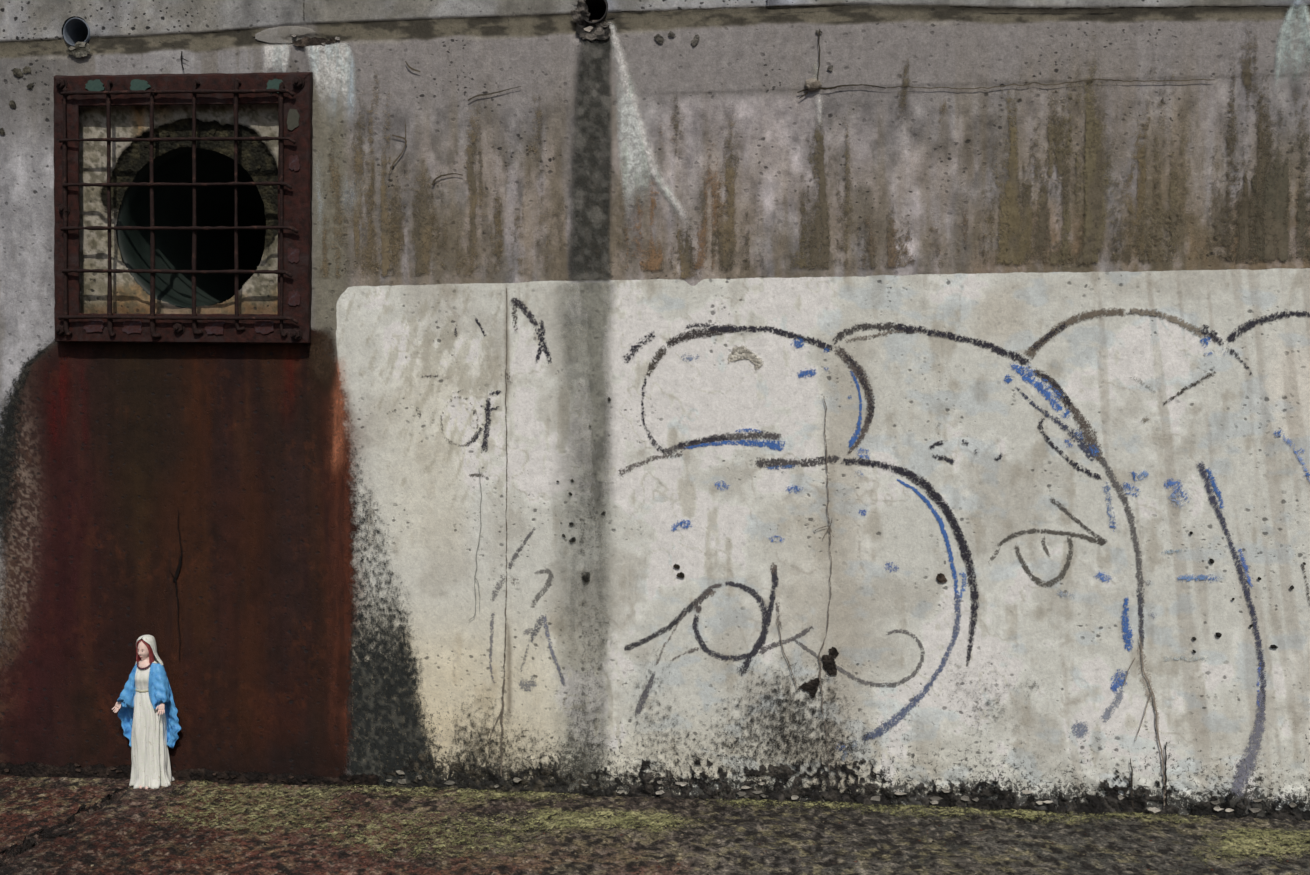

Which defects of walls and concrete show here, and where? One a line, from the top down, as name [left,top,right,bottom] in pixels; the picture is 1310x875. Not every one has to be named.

water stain [790,99,913,270]
water stain [898,60,912,128]
water stain [958,0,1310,266]
water stain [0,341,54,554]
corrosion [0,320,360,778]
water stain [346,26,765,797]
water stain [635,655,876,800]